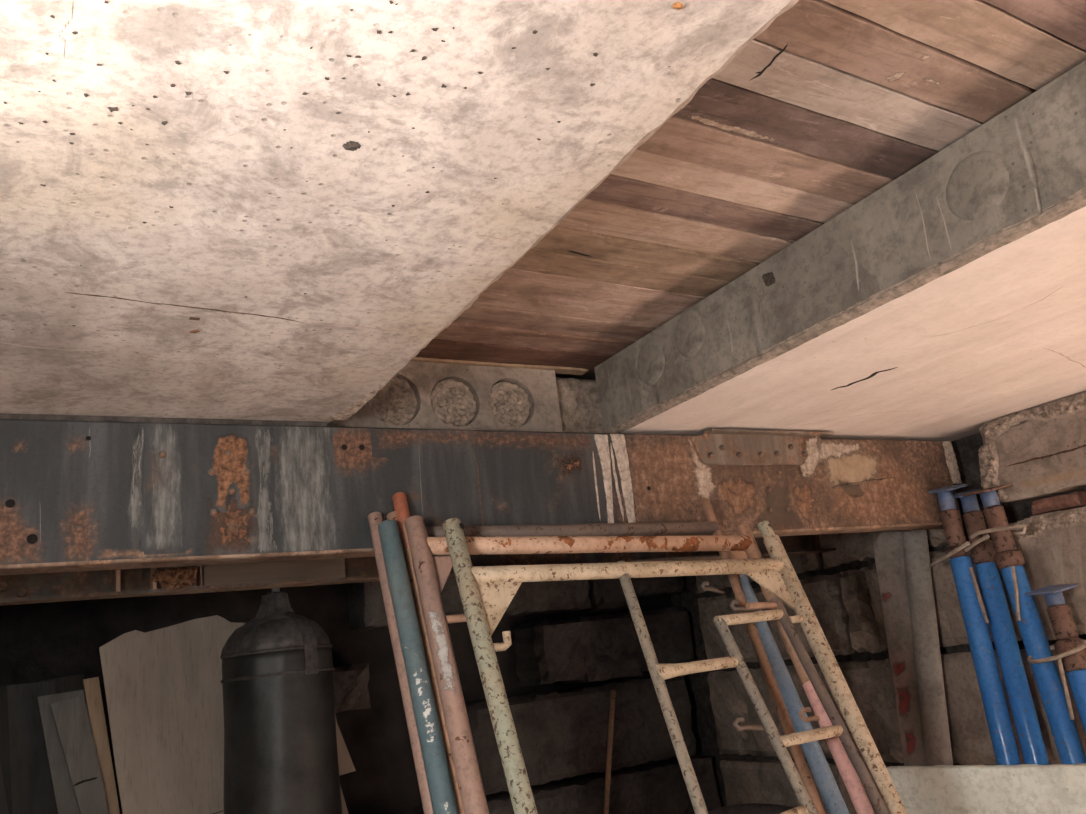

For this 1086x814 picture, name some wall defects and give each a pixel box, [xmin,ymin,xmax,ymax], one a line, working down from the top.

crack [749,44,788,81]
crack [64,292,412,332]
crack [830,367,897,391]
corrosion [616,434,701,523]
peeling [800,436,879,486]
corrosion [819,444,938,527]
corrosion [0,492,50,565]